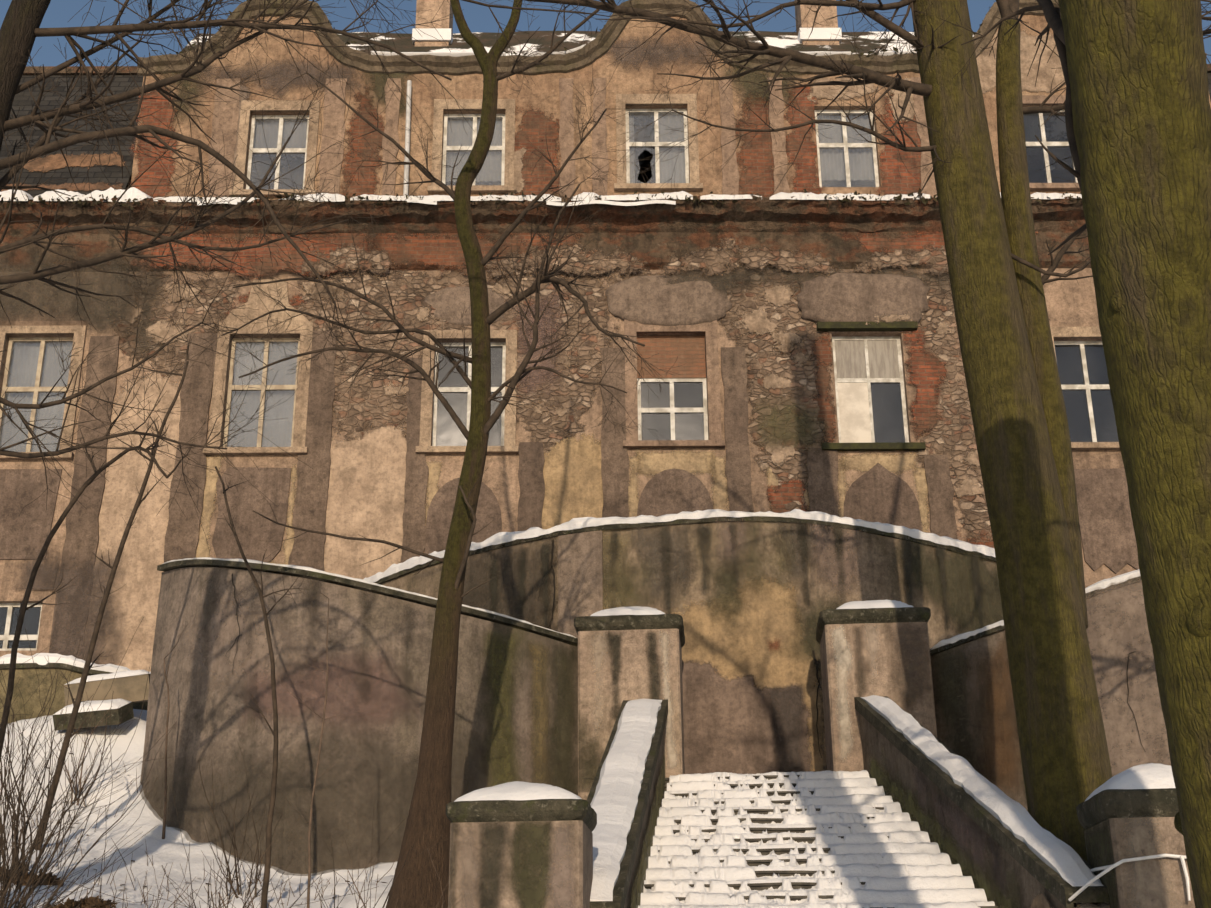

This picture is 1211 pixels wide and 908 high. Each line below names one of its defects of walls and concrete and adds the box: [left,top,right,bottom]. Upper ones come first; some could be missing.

flaking render [130,87,178,198]
flaking render [508,107,560,196]
flaking render [735,76,921,197]
flaking render [478,231,994,548]
flaking render [95,233,471,672]
leakage [602,524,746,614]
leakage [896,538,1003,633]
leakage [194,576,409,724]
leakage [648,633,676,767]
crack [812,650,822,758]
leakage [142,741,418,876]
leakage [450,821,573,908]